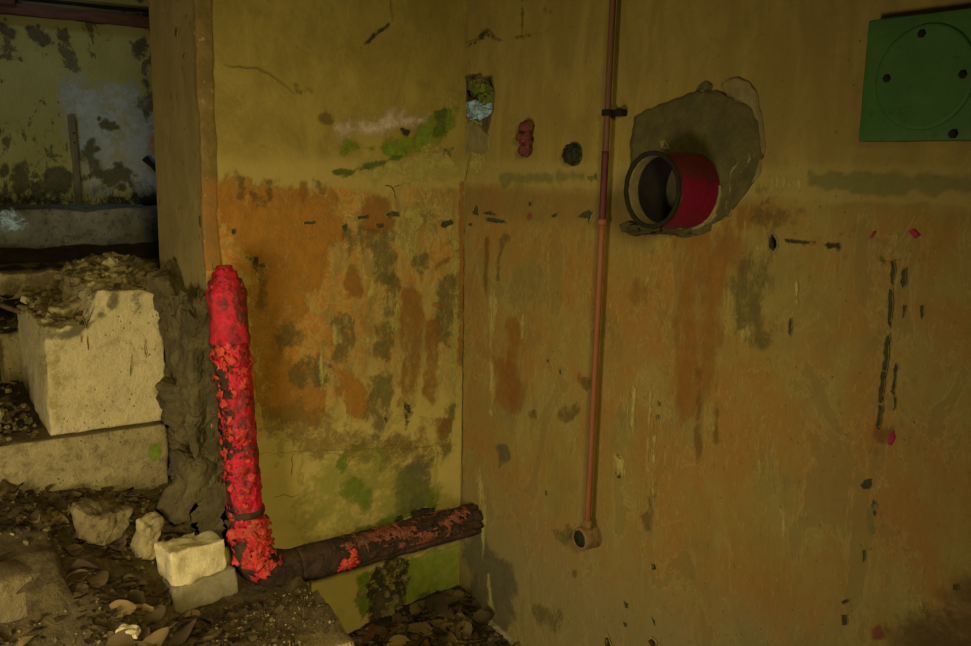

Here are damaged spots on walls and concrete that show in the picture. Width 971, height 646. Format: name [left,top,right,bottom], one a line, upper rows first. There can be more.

damp [336,113,423,133]
spalling [465,73,495,134]